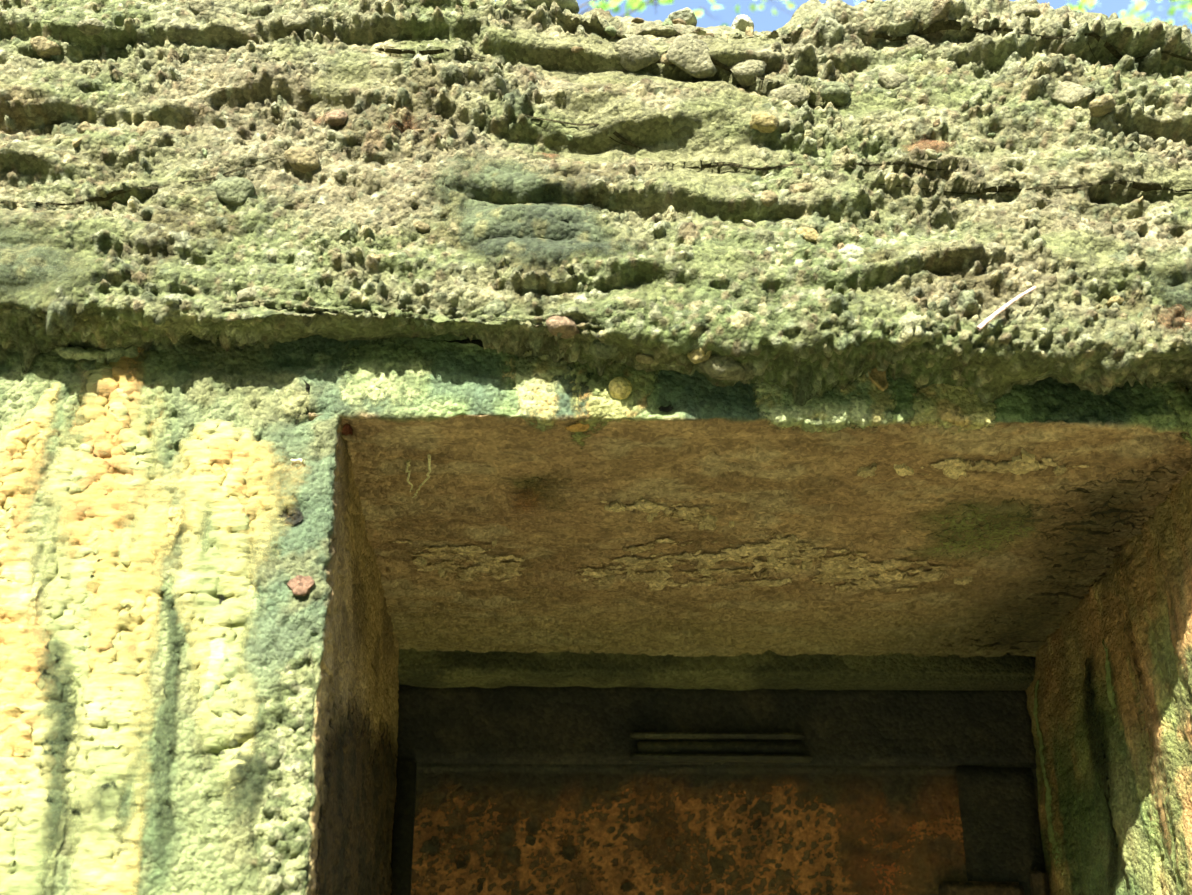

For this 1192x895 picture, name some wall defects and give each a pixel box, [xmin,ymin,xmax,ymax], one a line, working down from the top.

crack [854,20,1192,65]
crack [518,114,1192,195]
leakage [985,476,1158,649]
leakage [36,638,73,845]
leakage [153,595,180,841]
leakage [203,637,231,703]
leakage [228,753,267,814]
corrosion [411,780,964,895]
leakage [1083,640,1118,888]